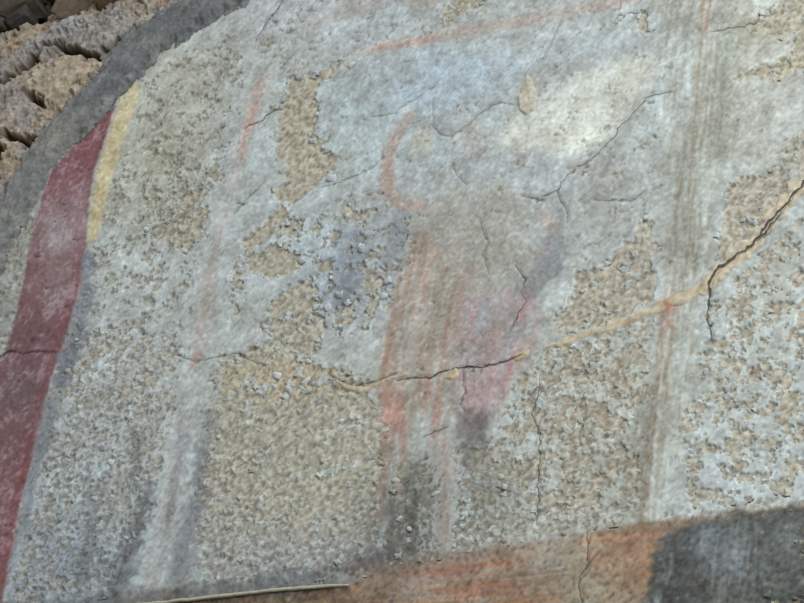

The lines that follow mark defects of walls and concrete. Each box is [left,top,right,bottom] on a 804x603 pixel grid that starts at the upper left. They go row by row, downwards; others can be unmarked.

flaking render [734,0,804,82]
crack [324,157,384,214]
crack [329,354,522,407]
flaking render [190,58,663,586]
crack [373,95,517,136]
crack [523,91,673,222]
flaking render [679,215,804,508]
crack [707,180,804,343]
flaking render [713,130,804,262]
crack [531,378,542,525]
crack [578,531,597,603]